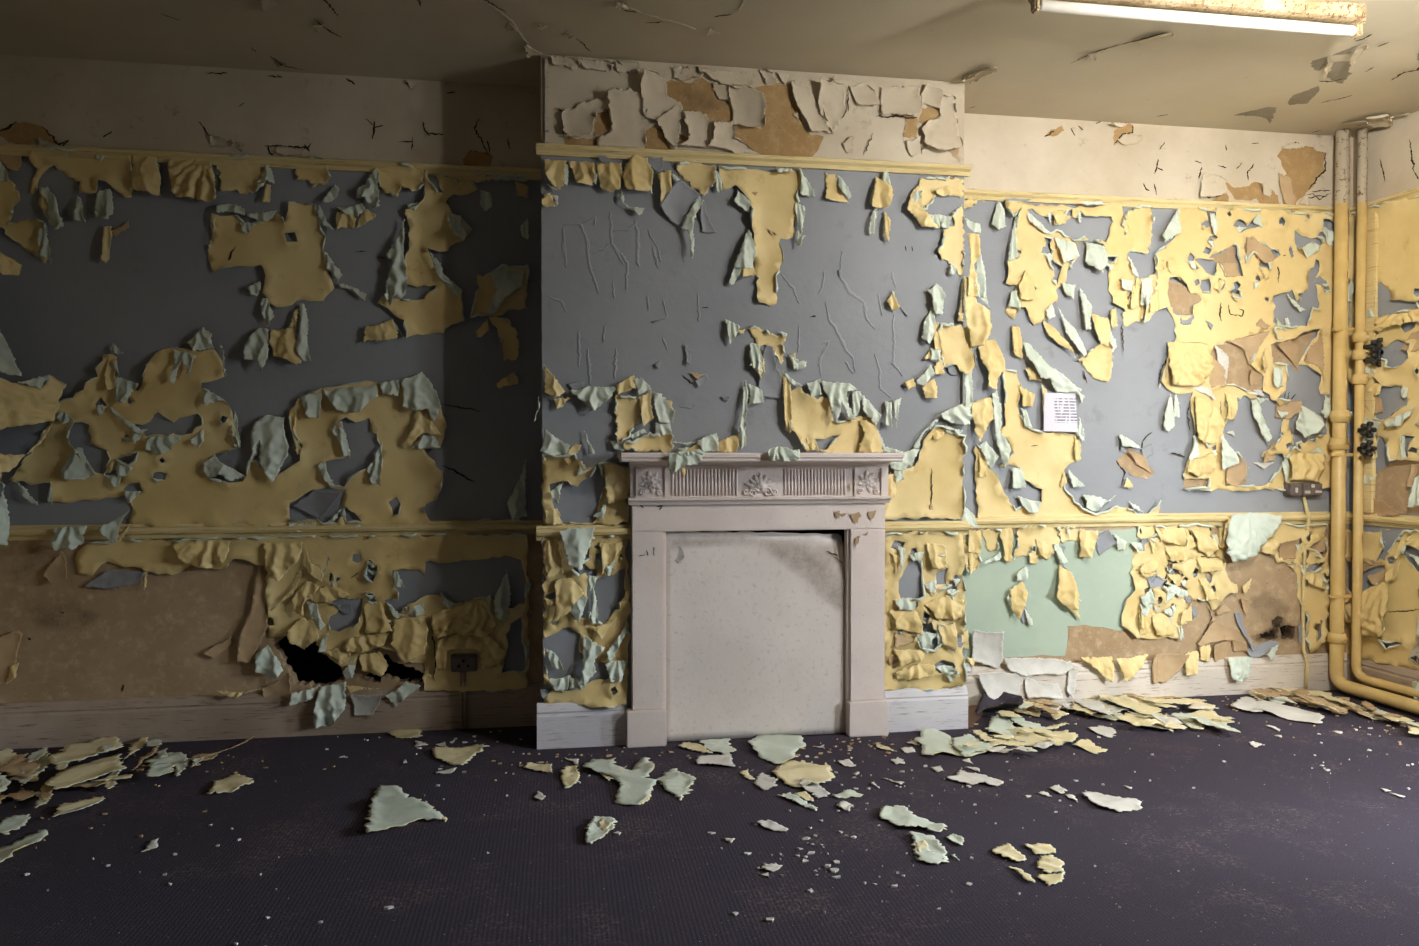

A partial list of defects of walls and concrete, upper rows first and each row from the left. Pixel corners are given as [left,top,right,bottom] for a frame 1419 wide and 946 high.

crack [483,0,591,90]
crack [608,0,745,35]
peeling [1288,34,1389,105]
spalling [1045,121,1143,145]
peeling [0,55,998,389]
peeling [0,139,1419,729]
damp [1408,588,1419,665]
peeling [388,729,446,747]